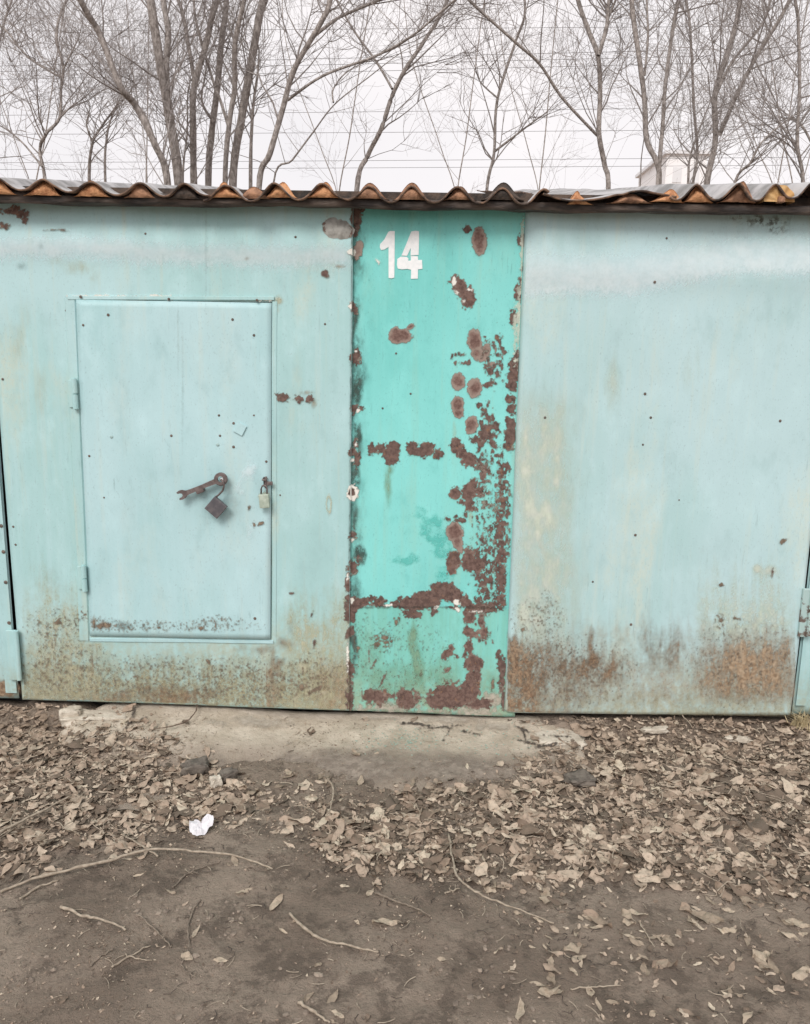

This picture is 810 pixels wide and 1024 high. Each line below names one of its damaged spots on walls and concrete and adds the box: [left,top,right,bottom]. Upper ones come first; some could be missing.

peeling [344,221,622,730]
corrosion [507,635,620,713]
corrosion [687,628,791,700]